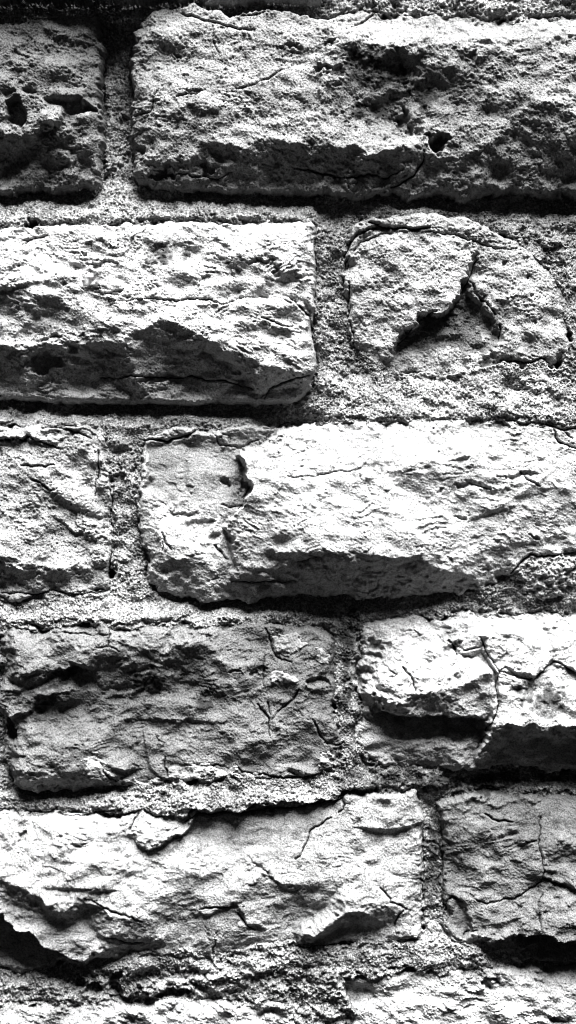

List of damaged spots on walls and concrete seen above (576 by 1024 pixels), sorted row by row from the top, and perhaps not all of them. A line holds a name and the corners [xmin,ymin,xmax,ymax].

crack [344,222,544,364]
crack [258,690,299,732]
crack [448,640,576,748]
crack [383,821,561,941]